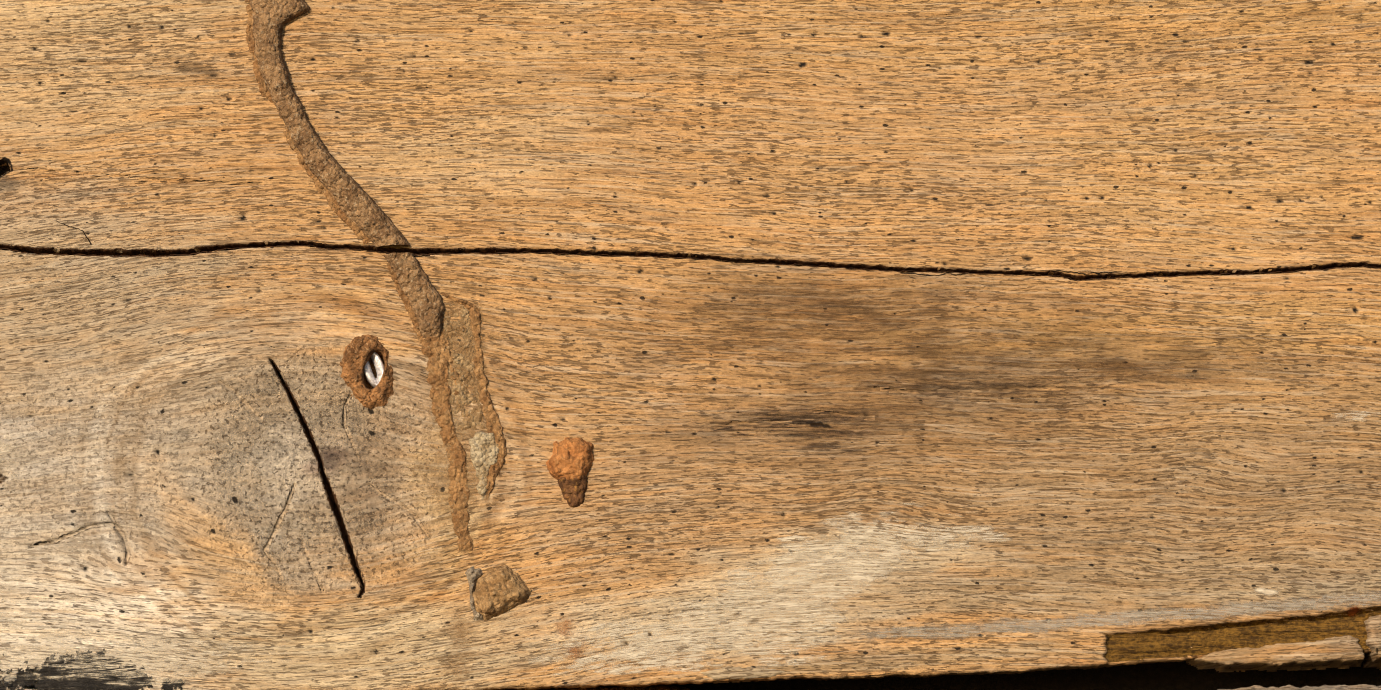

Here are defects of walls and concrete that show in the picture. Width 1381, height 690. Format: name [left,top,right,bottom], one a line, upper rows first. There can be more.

crack [0,221,1381,281]
crack [221,346,431,597]
damp [0,576,264,690]
spalling [1104,606,1381,662]